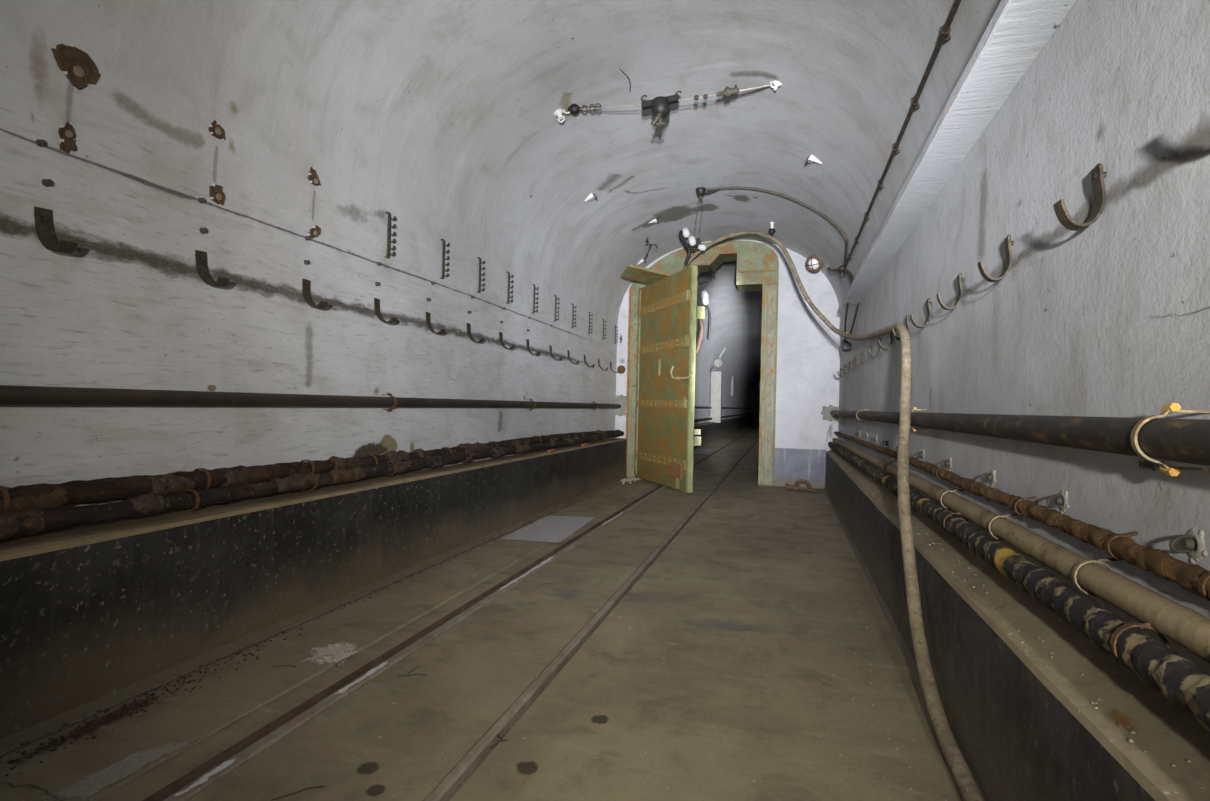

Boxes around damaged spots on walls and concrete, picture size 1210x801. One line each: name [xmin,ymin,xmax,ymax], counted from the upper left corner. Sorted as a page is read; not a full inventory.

leakage [117,95,232,181]
leakage [0,129,580,337]